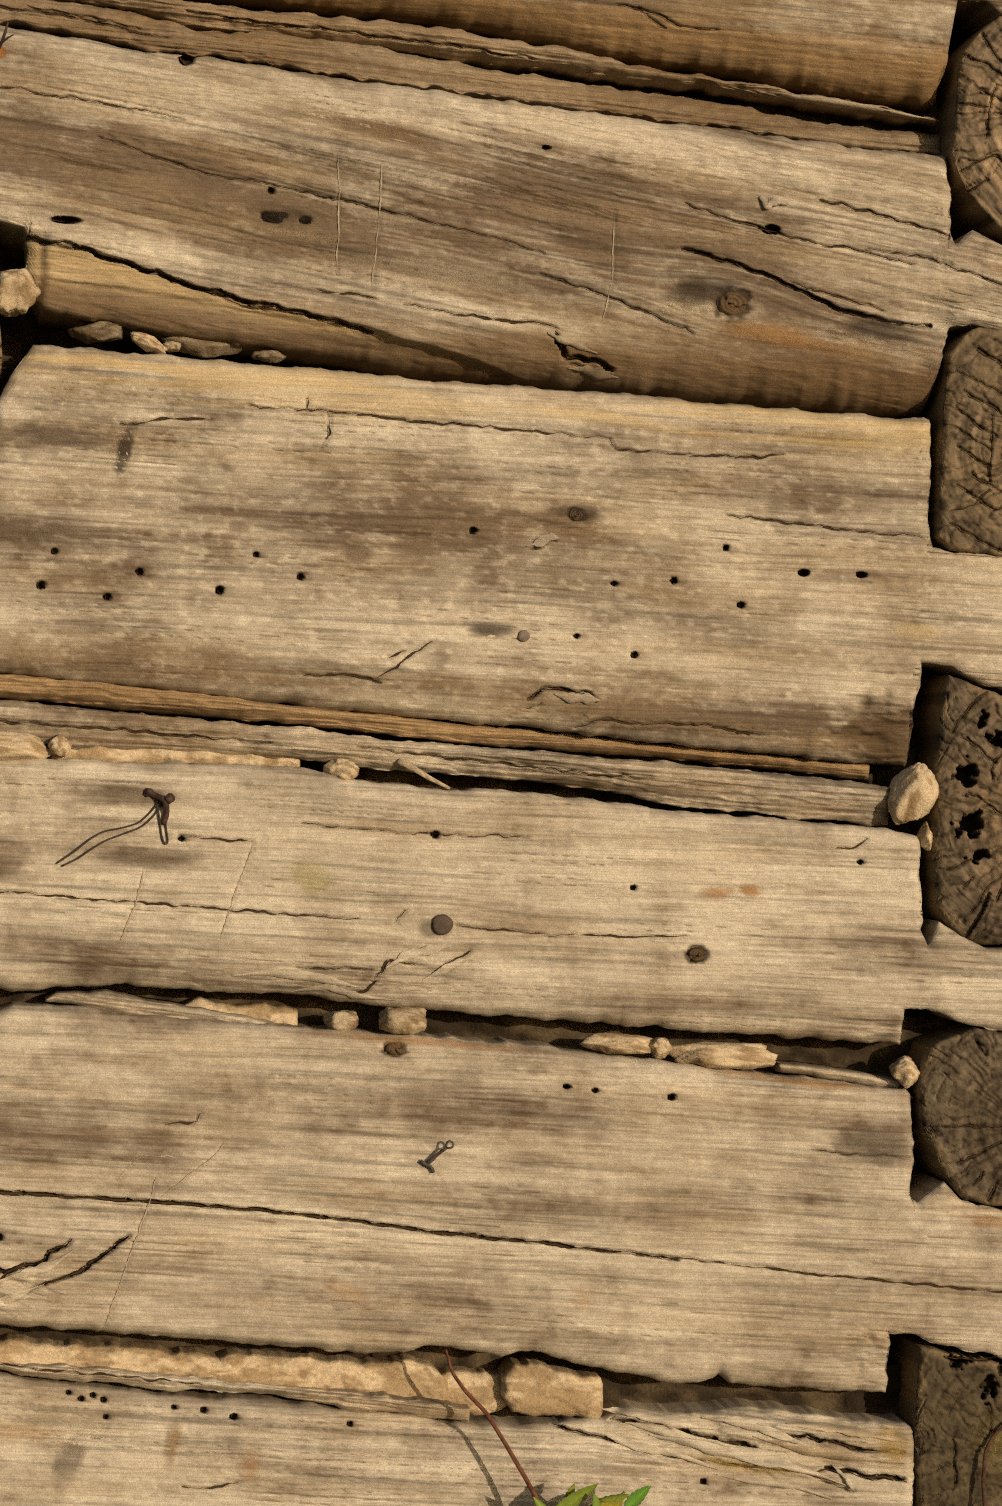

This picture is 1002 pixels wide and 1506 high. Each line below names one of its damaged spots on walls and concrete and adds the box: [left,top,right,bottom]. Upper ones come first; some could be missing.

crack [686,201,1002,286]
crack [26,236,612,370]
crack [683,248,933,327]
crack [305,641,432,683]
crack [298,925,686,993]
crack [0,1190,1002,1293]
crack [0,1363,201,1384]